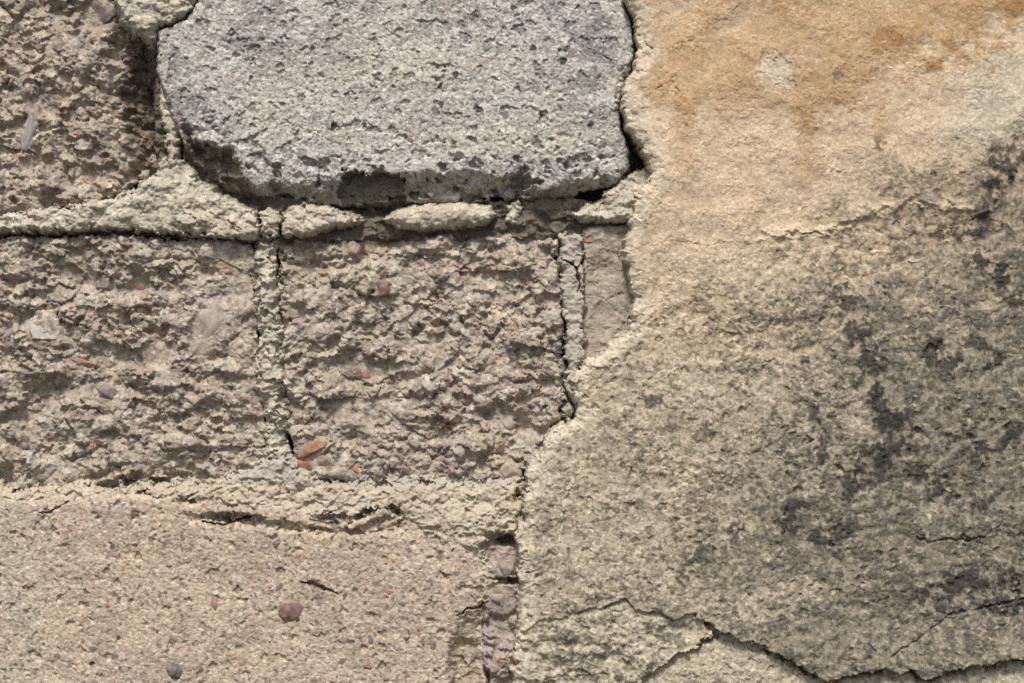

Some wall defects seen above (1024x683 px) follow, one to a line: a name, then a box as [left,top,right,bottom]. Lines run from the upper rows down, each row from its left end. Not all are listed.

crack [560,254,585,294]
crack [560,313,570,349]
crack [202,514,257,529]
crack [563,597,696,637]
crack [890,599,1017,658]
crack [543,671,612,682]